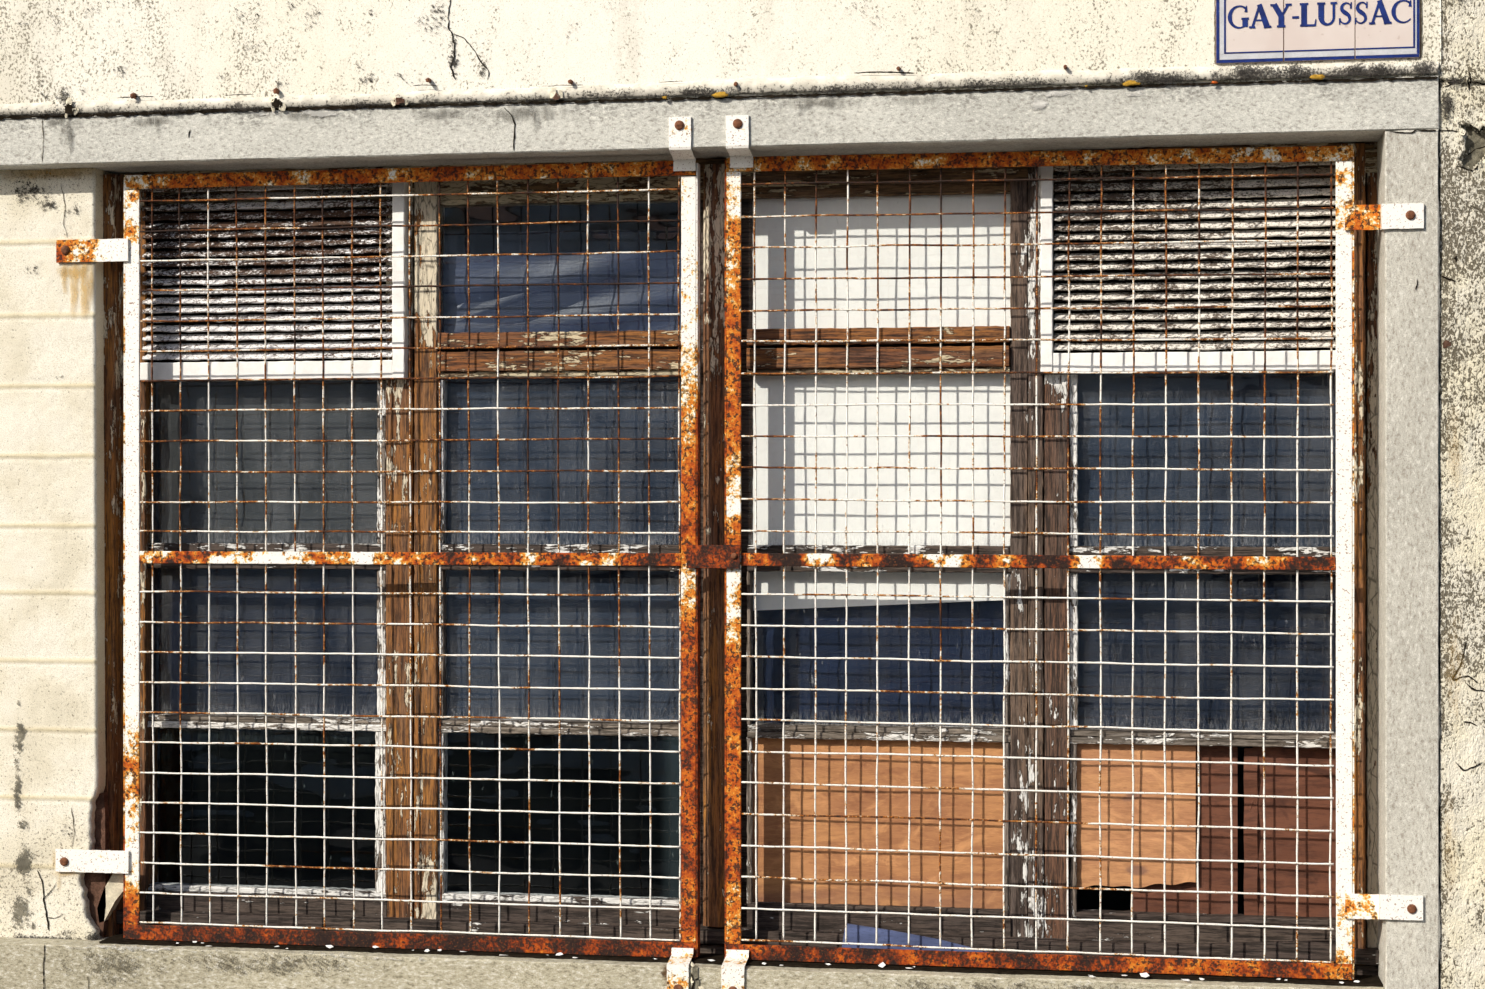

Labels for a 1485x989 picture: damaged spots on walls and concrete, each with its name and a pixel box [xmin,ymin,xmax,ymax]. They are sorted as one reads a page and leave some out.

crack [0,0,1485,155]
spalling [1456,120,1485,171]